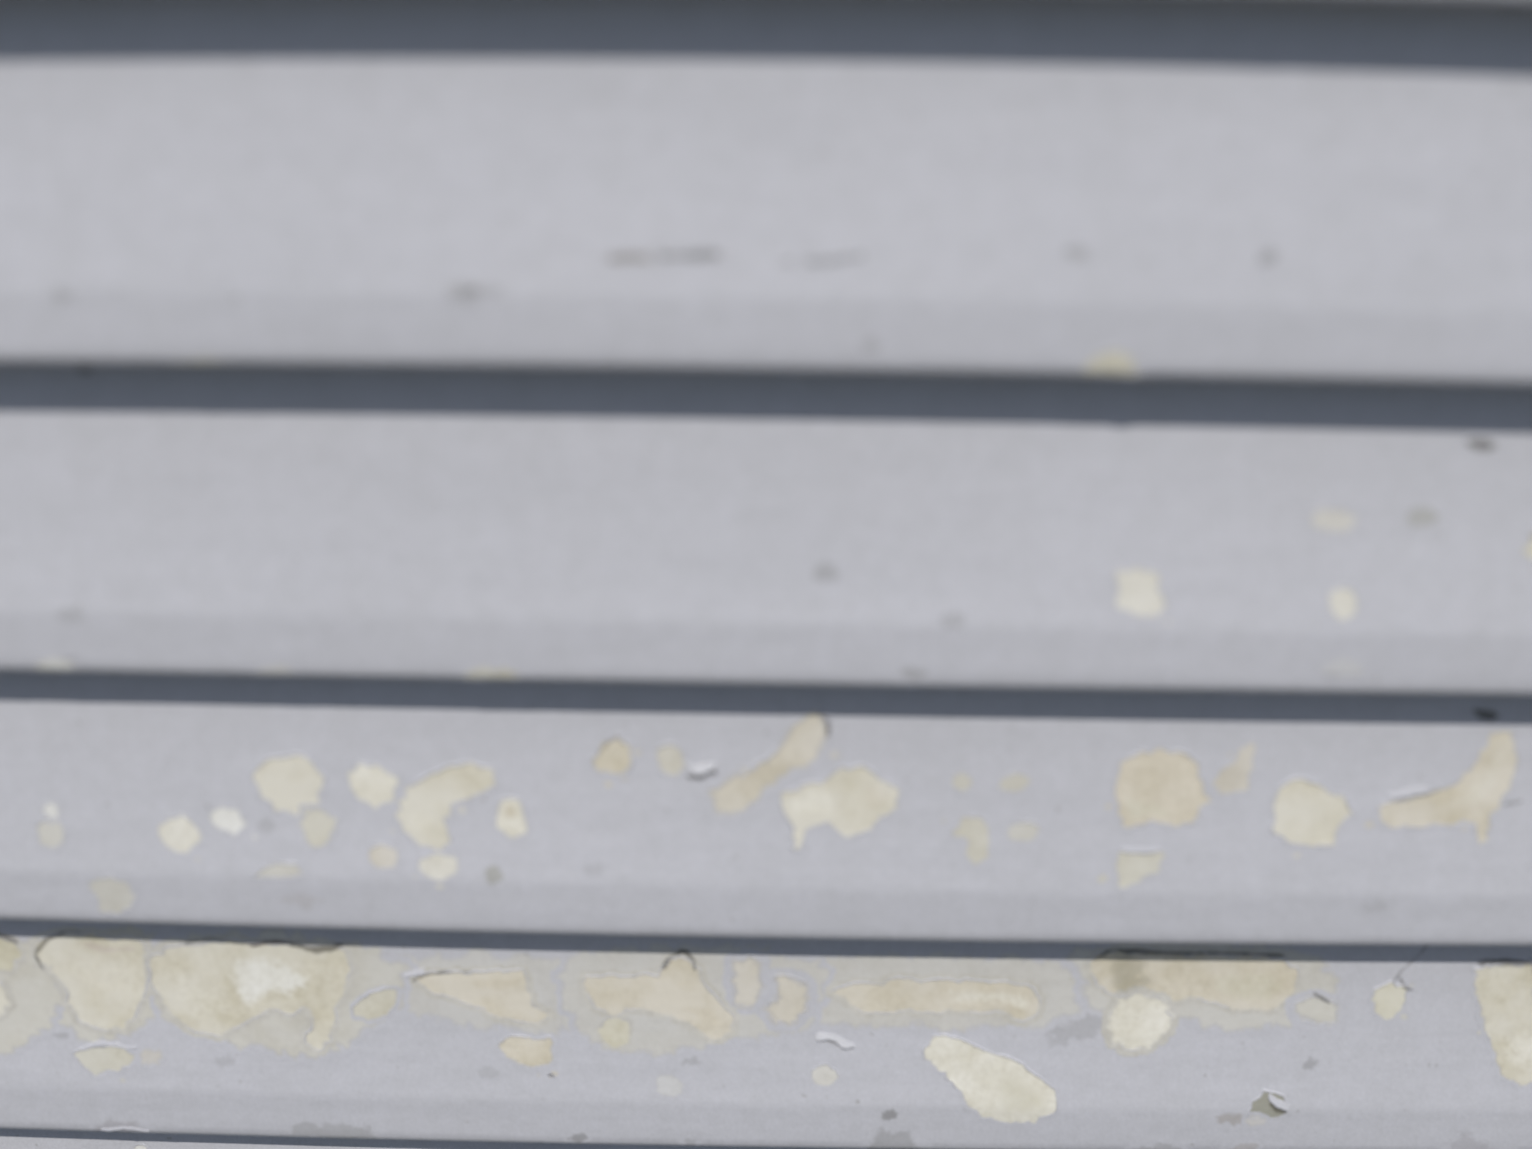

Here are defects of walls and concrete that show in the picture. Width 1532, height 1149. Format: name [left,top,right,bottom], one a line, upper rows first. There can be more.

peeling [1110,563,1172,627]
peeling [154,804,261,863]
peeling [249,751,532,891]
peeling [589,703,904,853]
peeling [1102,745,1219,832]
peeling [1267,706,1524,861]
peeling [0,873,1346,1127]
peeling [1469,959,1532,1089]